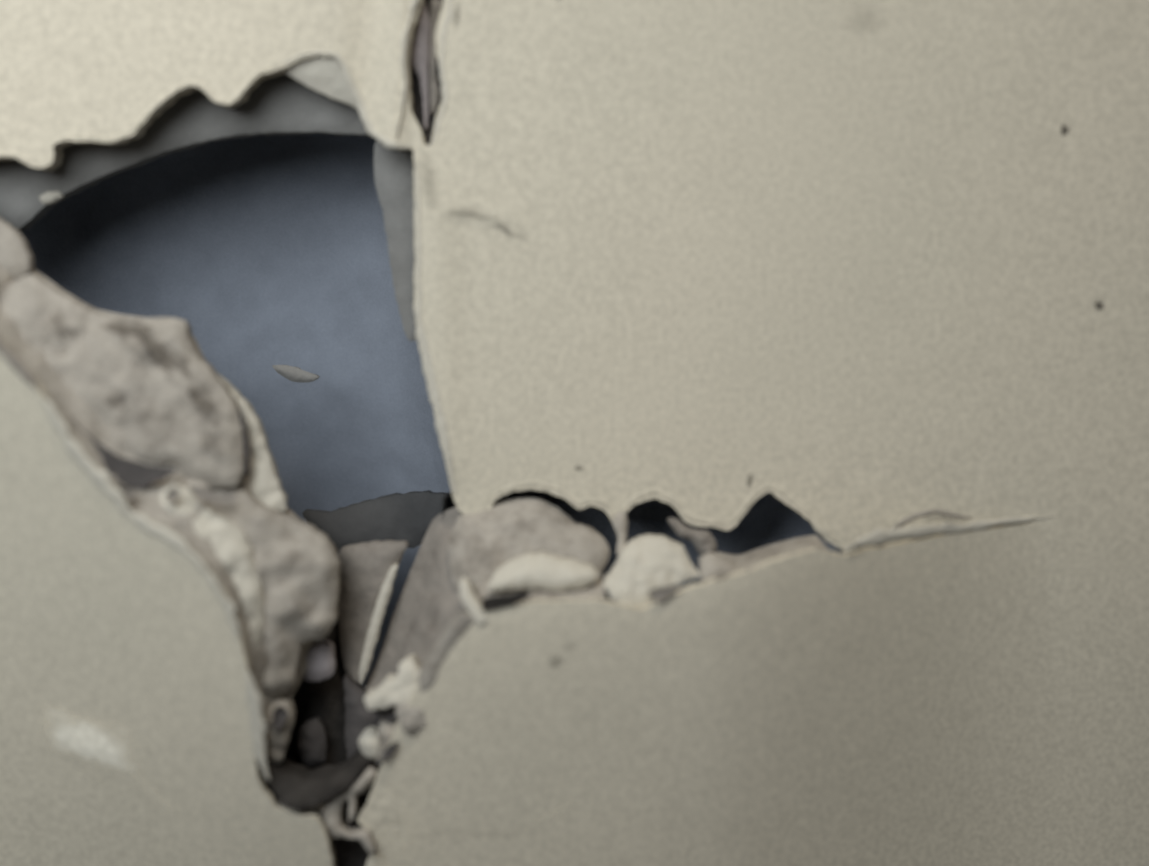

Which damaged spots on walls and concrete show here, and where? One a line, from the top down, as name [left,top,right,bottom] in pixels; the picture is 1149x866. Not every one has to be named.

crack [395,0,453,146]
spalling [0,50,467,811]
crack [418,481,1057,692]